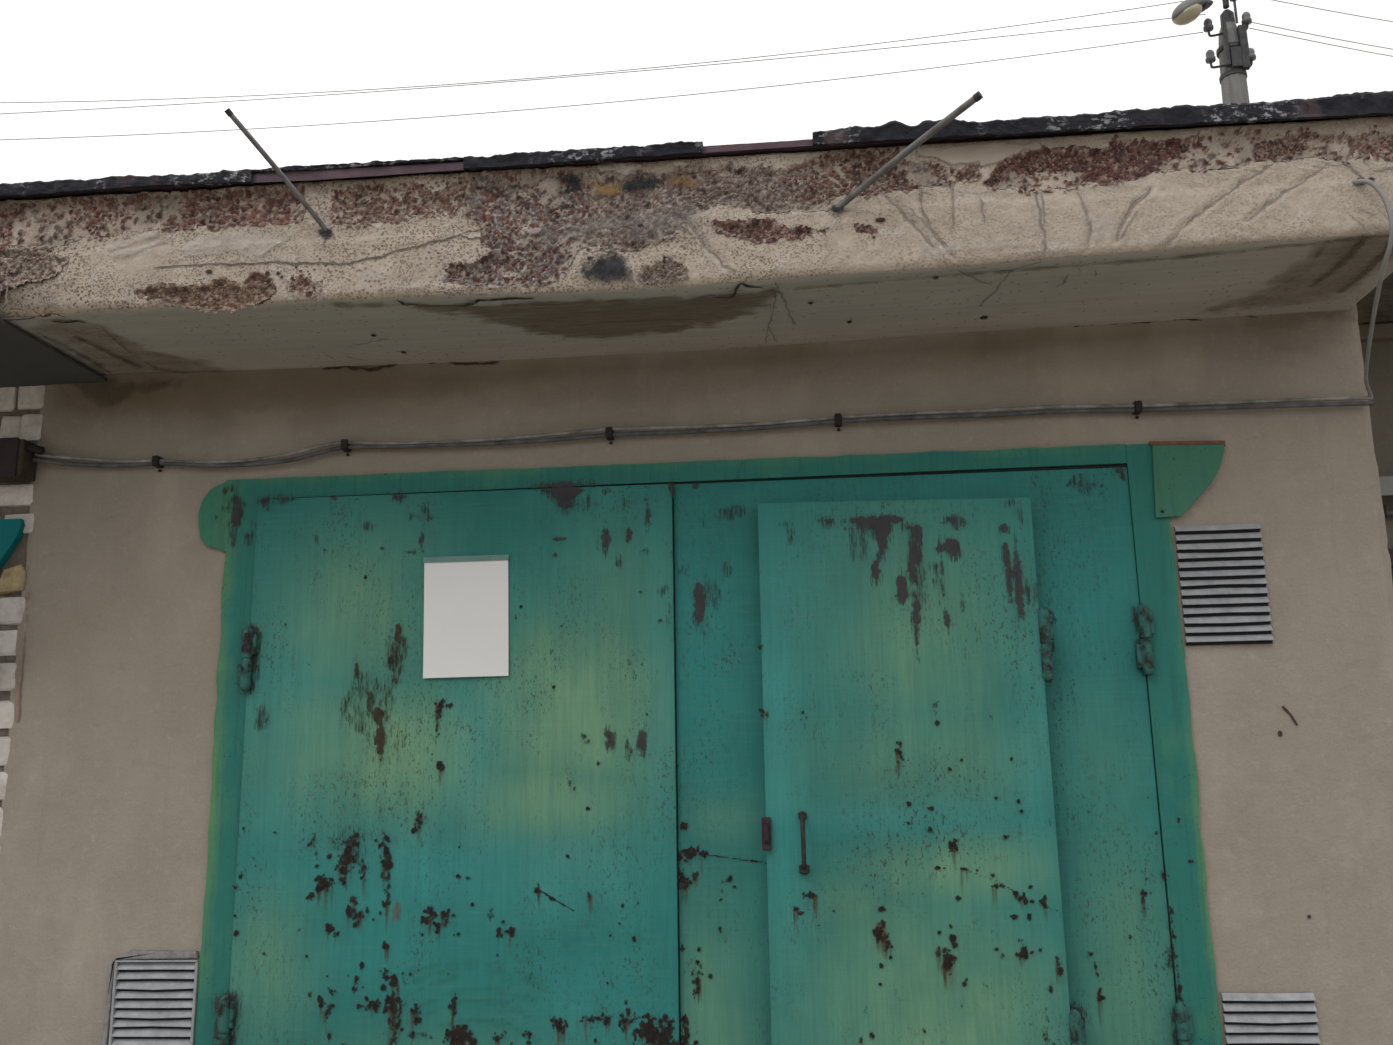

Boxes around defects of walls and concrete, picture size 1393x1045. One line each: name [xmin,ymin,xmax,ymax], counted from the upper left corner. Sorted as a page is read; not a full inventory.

spalling [0,184,324,314]
crack [154,229,515,268]
water stain [568,245,632,282]
spalling [329,123,1393,289]
crack [884,180,1152,307]
crack [1165,160,1393,249]
water stain [418,291,778,338]
crack [1074,319,1201,327]
corrosion [818,514,966,662]
corrosion [305,823,393,937]
corrosion [308,962,532,1045]
corrosion [550,1000,698,1045]